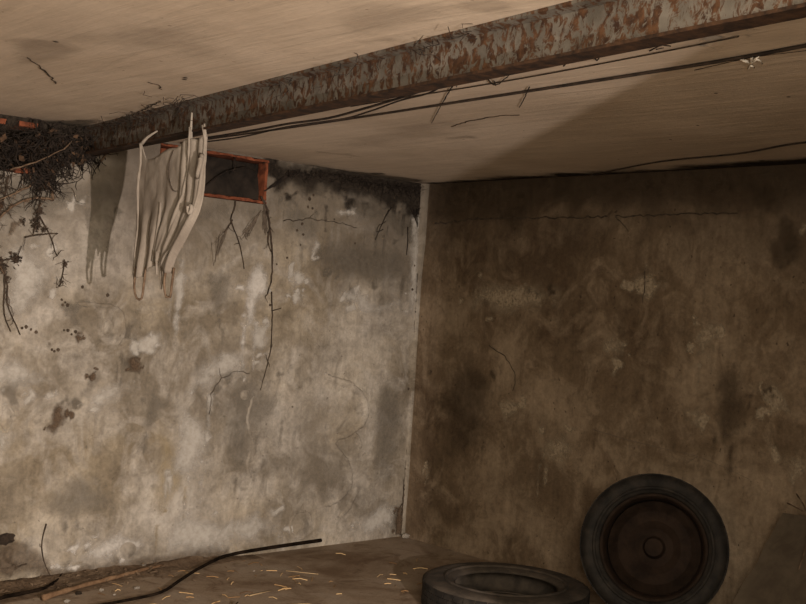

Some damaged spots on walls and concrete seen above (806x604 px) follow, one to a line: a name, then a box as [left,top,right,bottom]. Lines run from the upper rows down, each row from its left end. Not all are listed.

crack [27,57,56,84]
damp [265,158,421,313]
damp [11,251,44,309]
damp [173,261,185,327]
efflorescence [236,267,271,364]
damp [0,363,28,381]
damp [124,326,159,365]
efflorescence [199,354,244,383]
efflorescence [165,416,211,493]
damp [0,542,89,575]
damp [68,503,261,566]
damp [351,507,397,532]